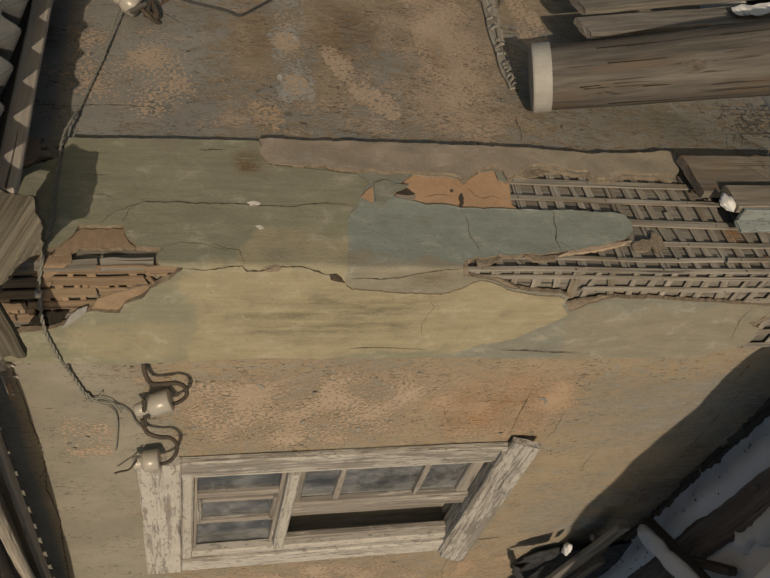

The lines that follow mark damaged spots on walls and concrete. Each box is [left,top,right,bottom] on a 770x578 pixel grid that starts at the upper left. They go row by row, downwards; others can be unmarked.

flaking render [360,170,553,209]
flaking render [0,229,178,328]
crack [170,242,457,282]
flaking render [525,232,665,263]
crack [12,368,69,577]